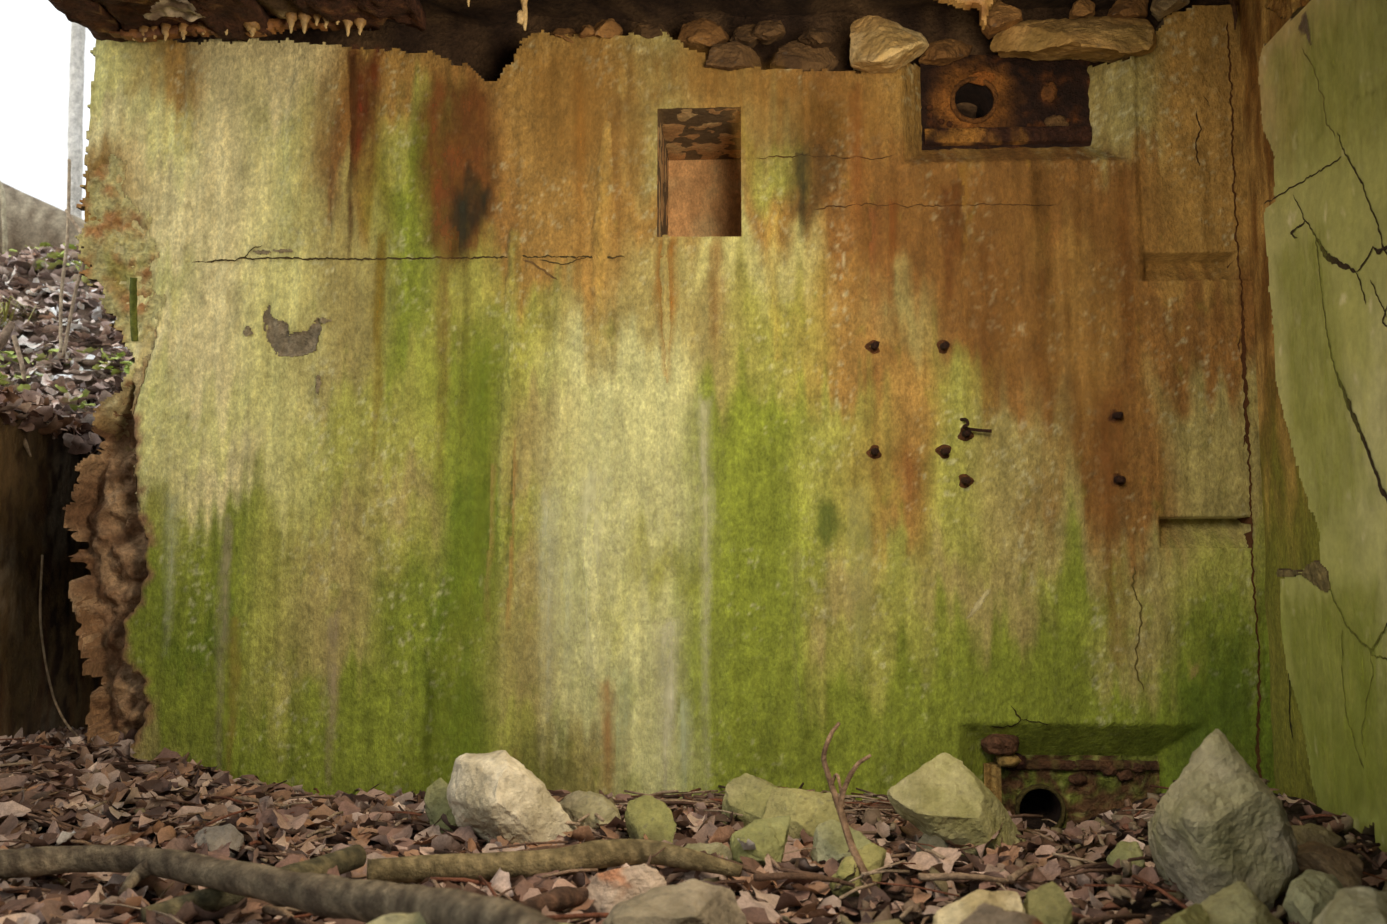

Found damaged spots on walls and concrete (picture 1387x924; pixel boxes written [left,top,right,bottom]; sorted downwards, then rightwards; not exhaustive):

peeling [1265,0,1311,22]
corrosion [970,71,996,86]
corrosion [1041,81,1069,126]
corrosion [421,80,491,259]
crack [192,246,624,280]
water stain [374,243,385,365]
peeling [243,305,332,357]
crack [1195,22,1387,778]
spalling [63,154,166,744]
corrosion [866,445,882,459]
corrosion [935,427,974,459]
corrosion [958,474,974,488]